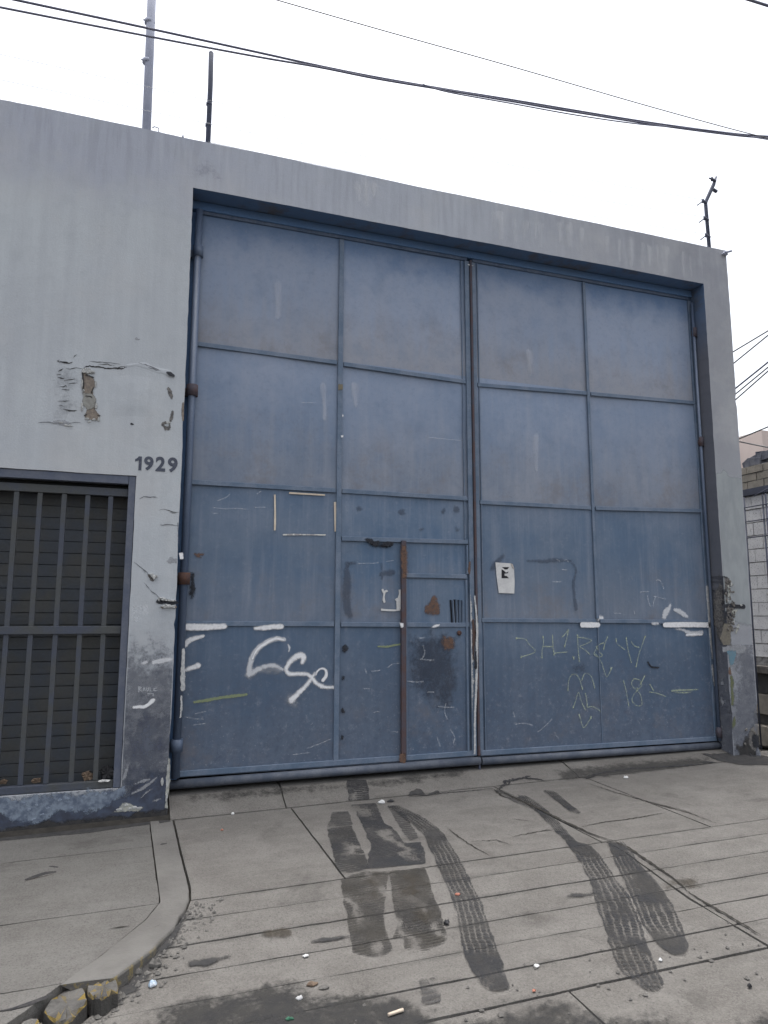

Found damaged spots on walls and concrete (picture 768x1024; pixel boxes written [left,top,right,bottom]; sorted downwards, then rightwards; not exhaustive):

flaking render [81,368,100,423]
peeling [161,372,184,430]
corrosion [424,596,440,615]
spalling [720,576,745,646]